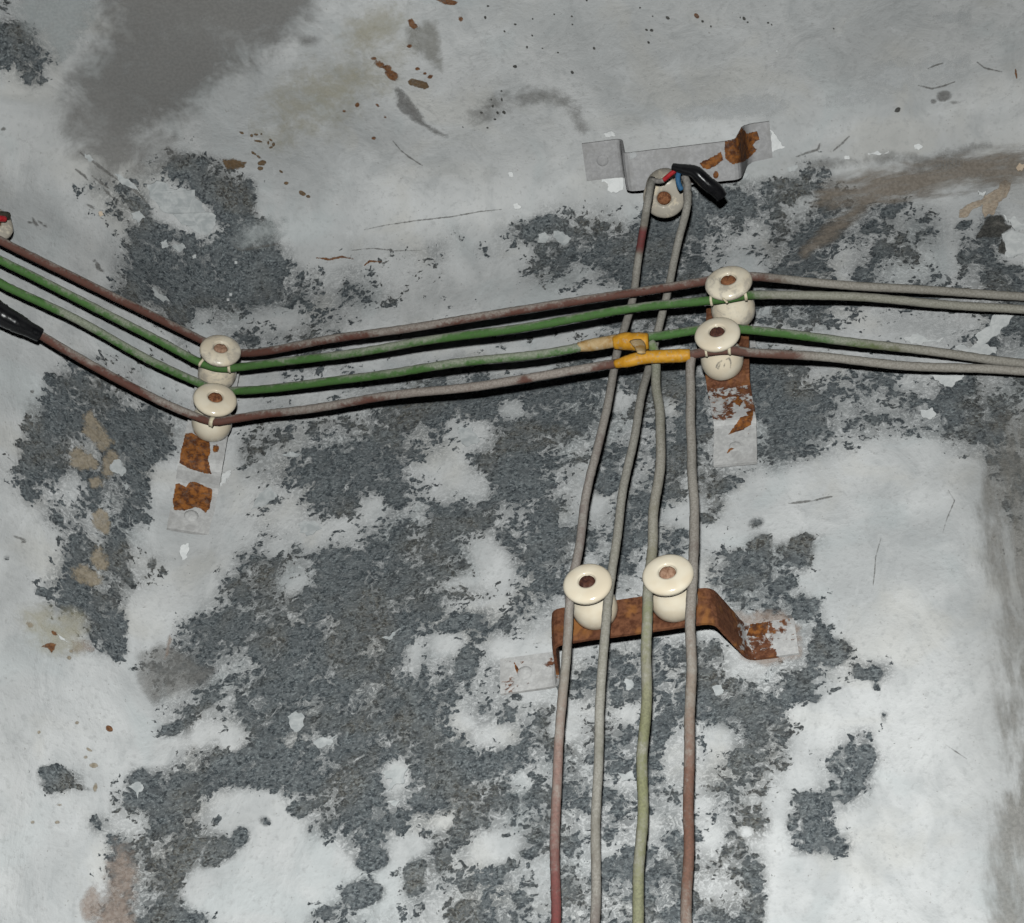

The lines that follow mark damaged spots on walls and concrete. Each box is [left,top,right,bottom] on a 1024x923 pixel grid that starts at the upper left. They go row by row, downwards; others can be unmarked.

leakage [69,0,308,172]
rust [371,57,433,89]
peeling [72,136,275,332]
peeling [602,177,623,193]
rust [700,127,760,178]
flaking render [959,181,1024,267]
leakage [499,151,1024,592]
rust [729,396,753,434]
rust [173,433,219,513]
peeling [180,543,189,561]
leakage [3,232,689,923]
rust [742,613,799,640]